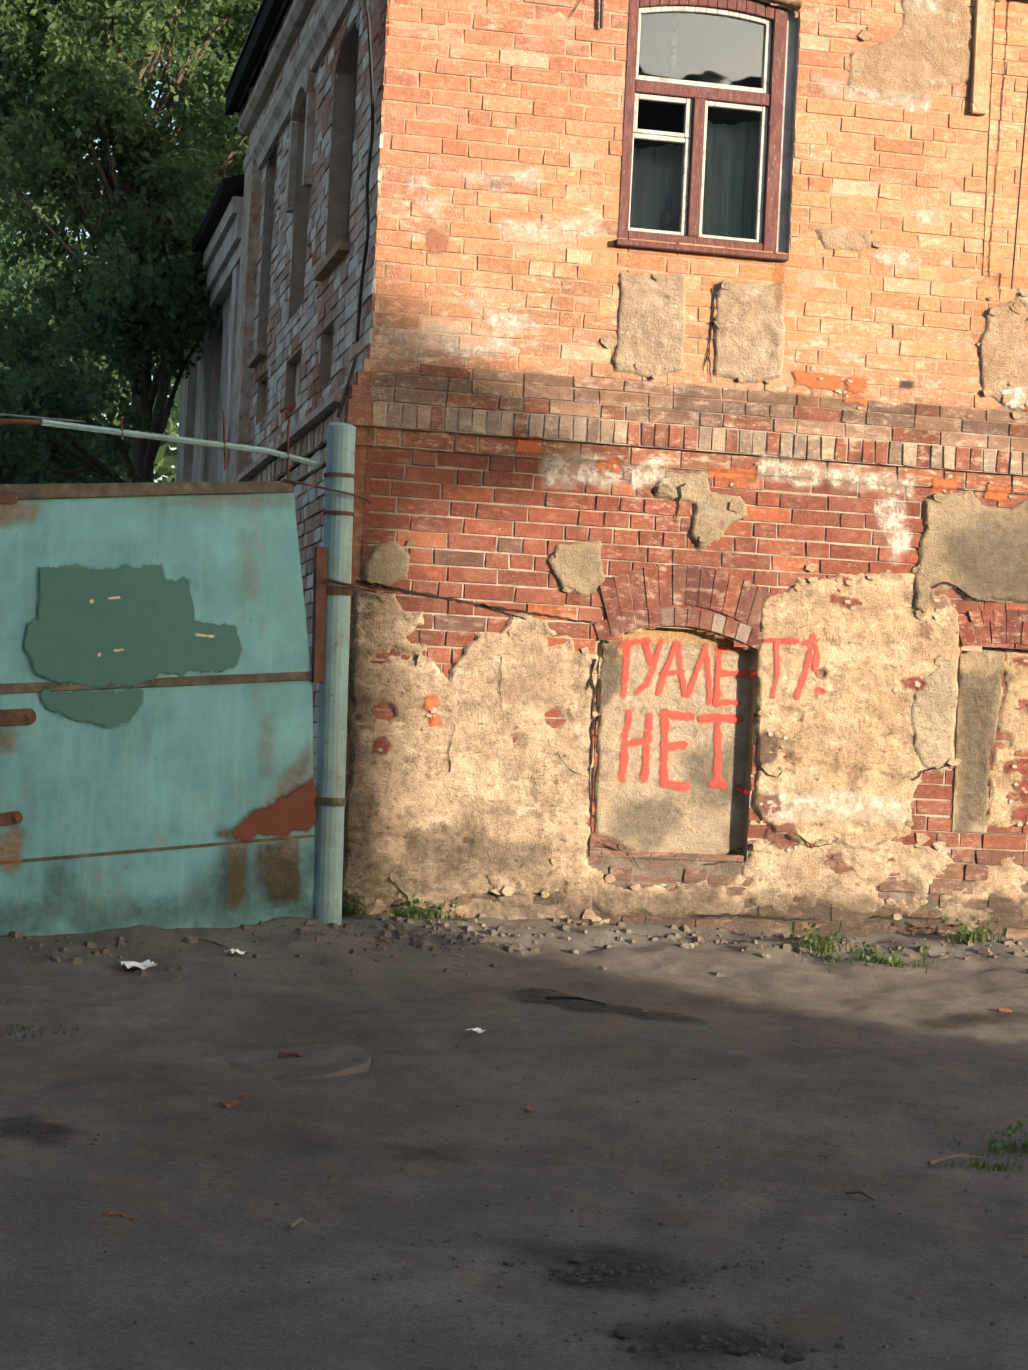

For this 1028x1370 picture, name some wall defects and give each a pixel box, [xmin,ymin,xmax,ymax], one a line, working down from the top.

crack [703,287,715,378]
flaking render [514,431,547,455]
flaking render [596,455,623,472]
peeling [342,463,1028,928]
rust [218,772,319,907]